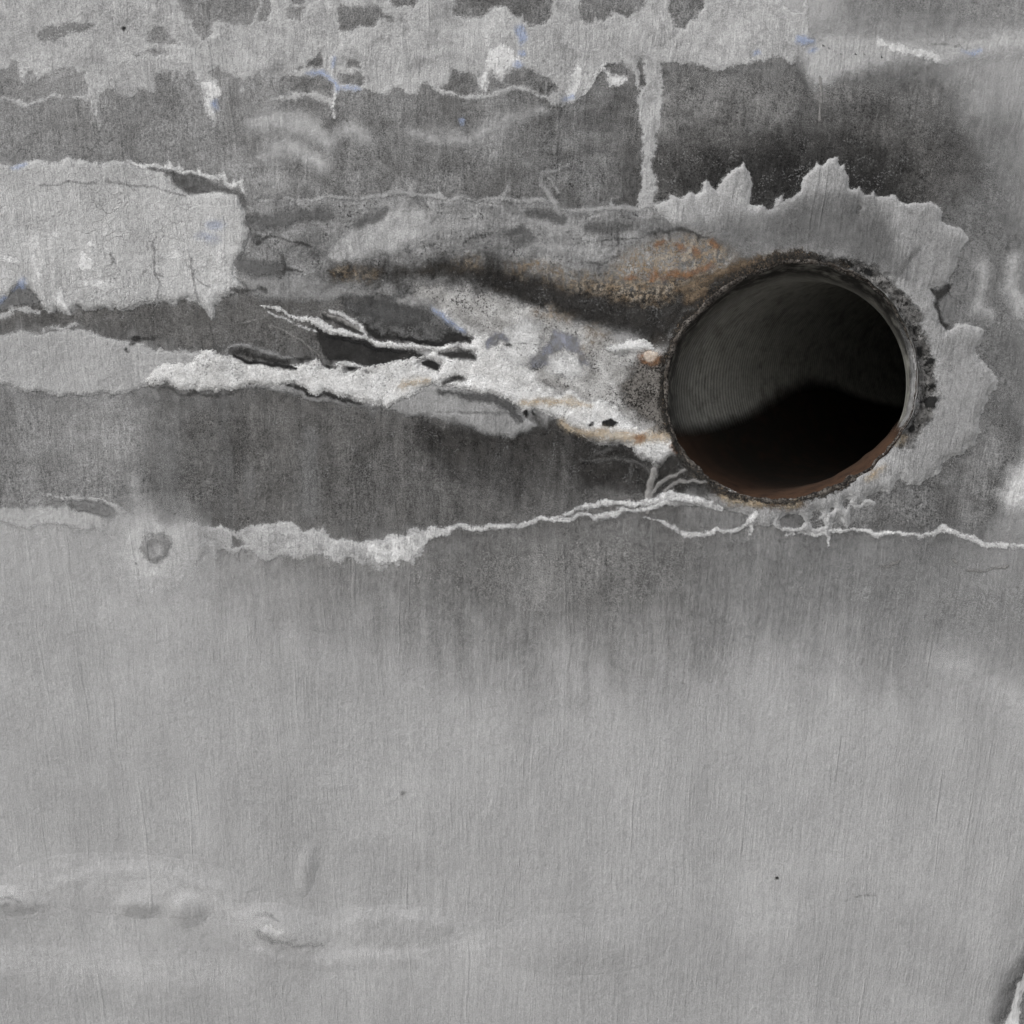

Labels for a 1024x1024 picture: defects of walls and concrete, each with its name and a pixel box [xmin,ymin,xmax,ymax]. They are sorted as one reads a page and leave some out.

flaking render [0,155,250,320]
damp [0,257,756,631]
damp [0,0,1024,552]
rust [518,237,800,305]
spalling [820,255,939,449]
spalling [930,284,957,329]